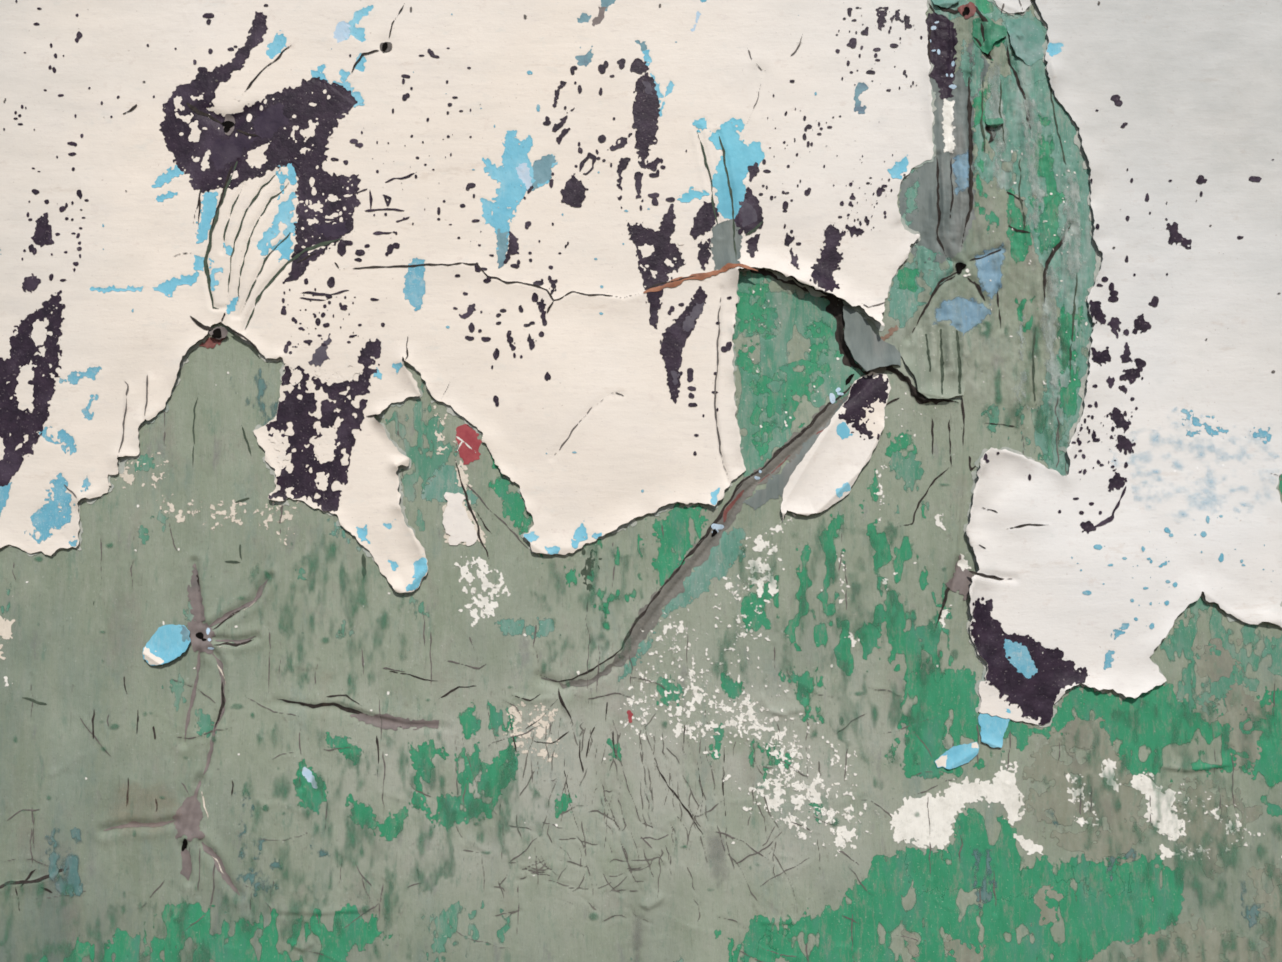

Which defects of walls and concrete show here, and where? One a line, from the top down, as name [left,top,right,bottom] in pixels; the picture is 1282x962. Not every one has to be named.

corrosion [643,263,758,293]
peeling [24,473,91,546]
peeling [109,373,155,486]
crack [79,0,1078,962]
peeling [247,0,1282,818]
crack [23,695,47,711]
peeling [142,601,217,738]
peeling [345,701,520,841]
crack [1079,787,1092,817]
crack [1213,735,1234,828]
peeling [64,902,393,962]
peeling [714,806,1186,962]